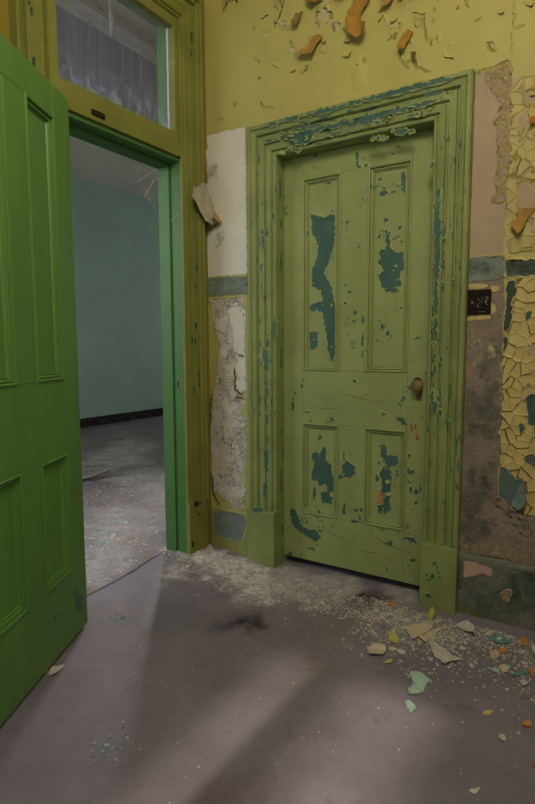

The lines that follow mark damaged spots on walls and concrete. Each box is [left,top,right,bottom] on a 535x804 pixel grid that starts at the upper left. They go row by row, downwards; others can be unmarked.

peeling [286,0,369,74]
peeling [387,17,421,60]
crack [377,0,455,73]
crack [475,0,527,74]
peeling [262,75,453,155]
peeling [309,213,365,363]
peeling [376,217,405,294]
flaking render [460,59,535,578]
peeling [311,433,363,524]
peeling [375,444,422,515]